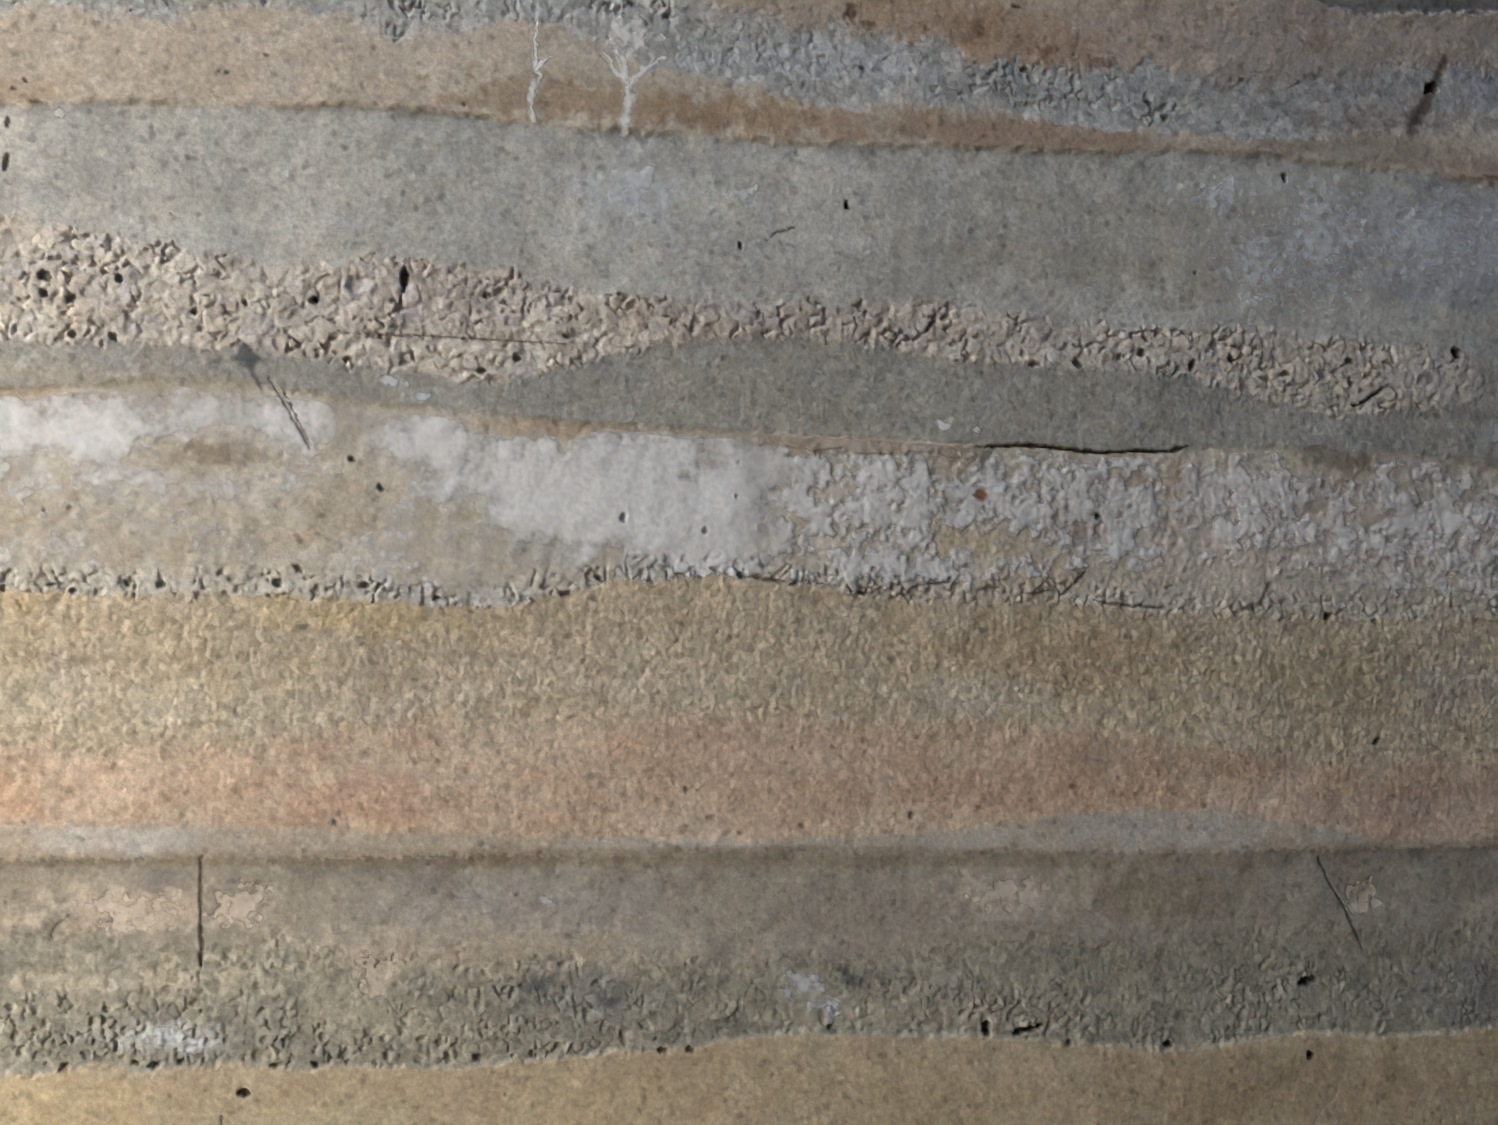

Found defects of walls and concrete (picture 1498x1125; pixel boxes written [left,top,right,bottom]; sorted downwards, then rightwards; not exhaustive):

damp [527,21,553,123]
damp [602,0,666,137]
crack [985,444,1187,454]
crack [197,854,205,981]